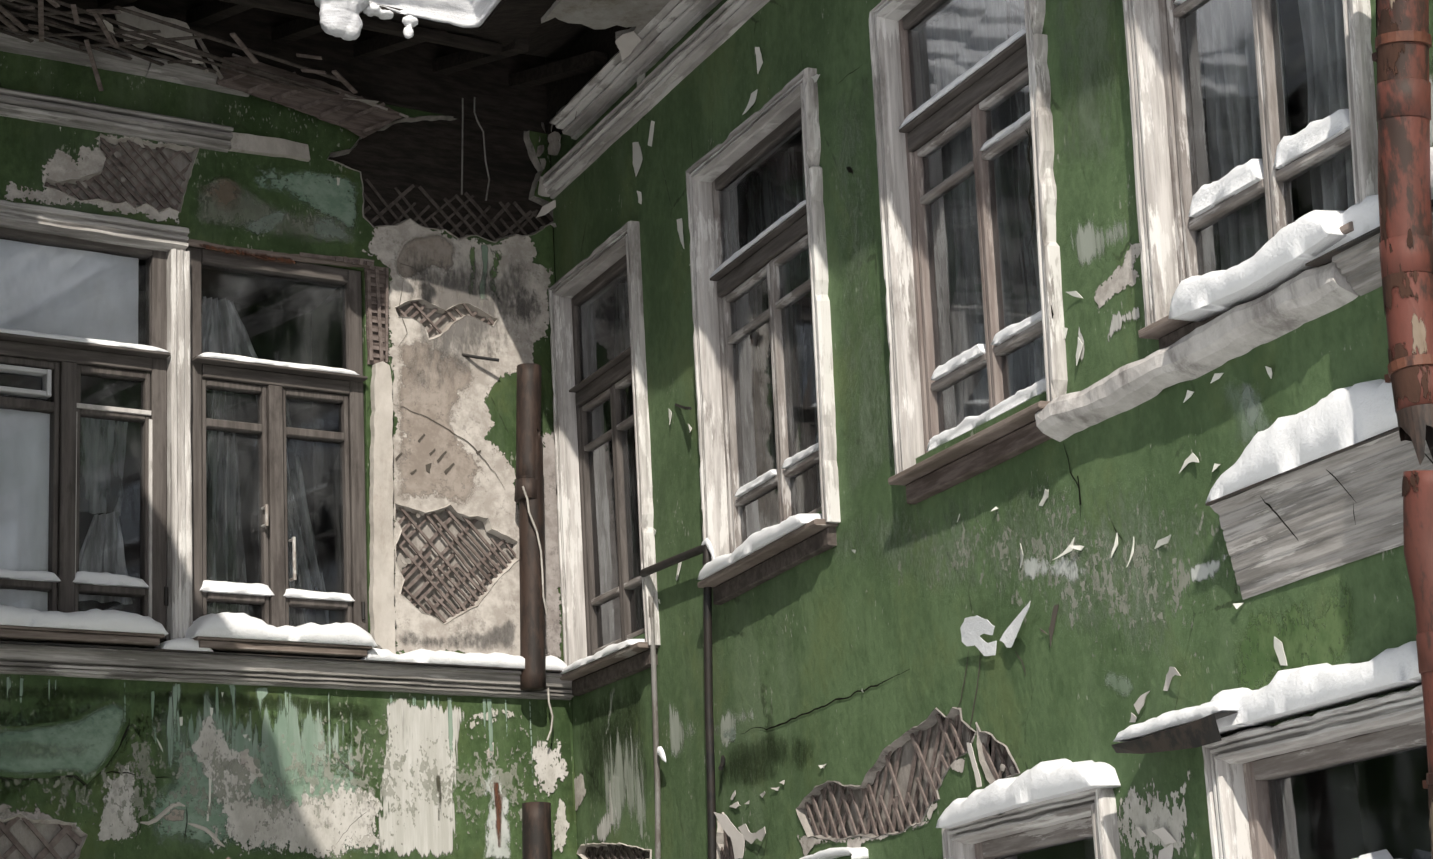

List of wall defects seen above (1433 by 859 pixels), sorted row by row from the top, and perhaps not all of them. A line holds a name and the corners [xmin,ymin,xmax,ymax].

rust [1376,0,1405,84]
flaking render [4,135,197,224]
flaking render [534,106,577,227]
rust [1379,159,1419,316]
rust [1388,342,1431,413]
flaking render [362,219,553,656]
crack [742,669,909,734]
peeling [0,692,586,858]
peeling [585,689,644,845]
flaking render [950,743,982,787]
flaking render [797,803,937,856]